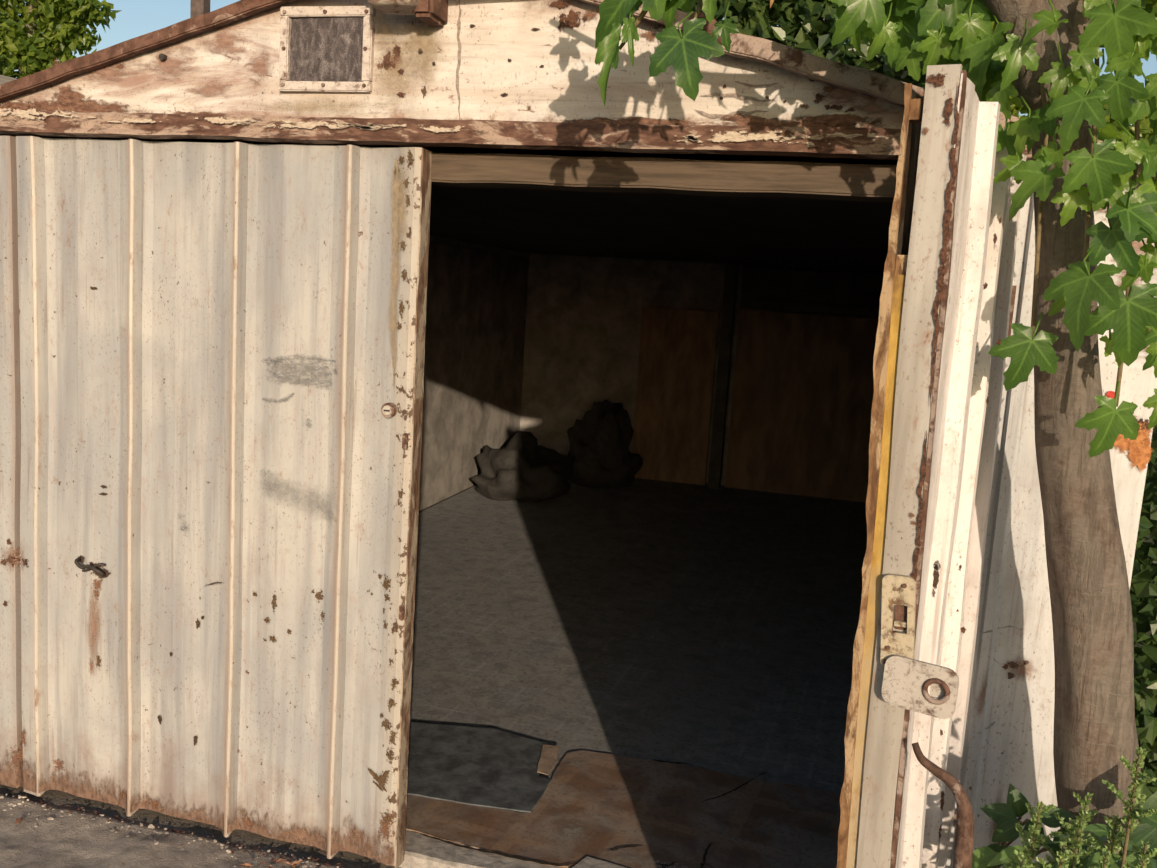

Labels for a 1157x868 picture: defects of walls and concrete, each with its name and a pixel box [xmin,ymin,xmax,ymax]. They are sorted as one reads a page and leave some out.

rust [548,0,599,32]
peeling [0,108,161,123]
peeling [195,116,407,130]
peeling [421,125,465,133]
peeling [675,129,886,147]
rust [909,70,967,652]
rust [1113,416,1152,470]
rust [78,555,110,671]
rust [0,730,394,866]
rust [890,709,910,868]